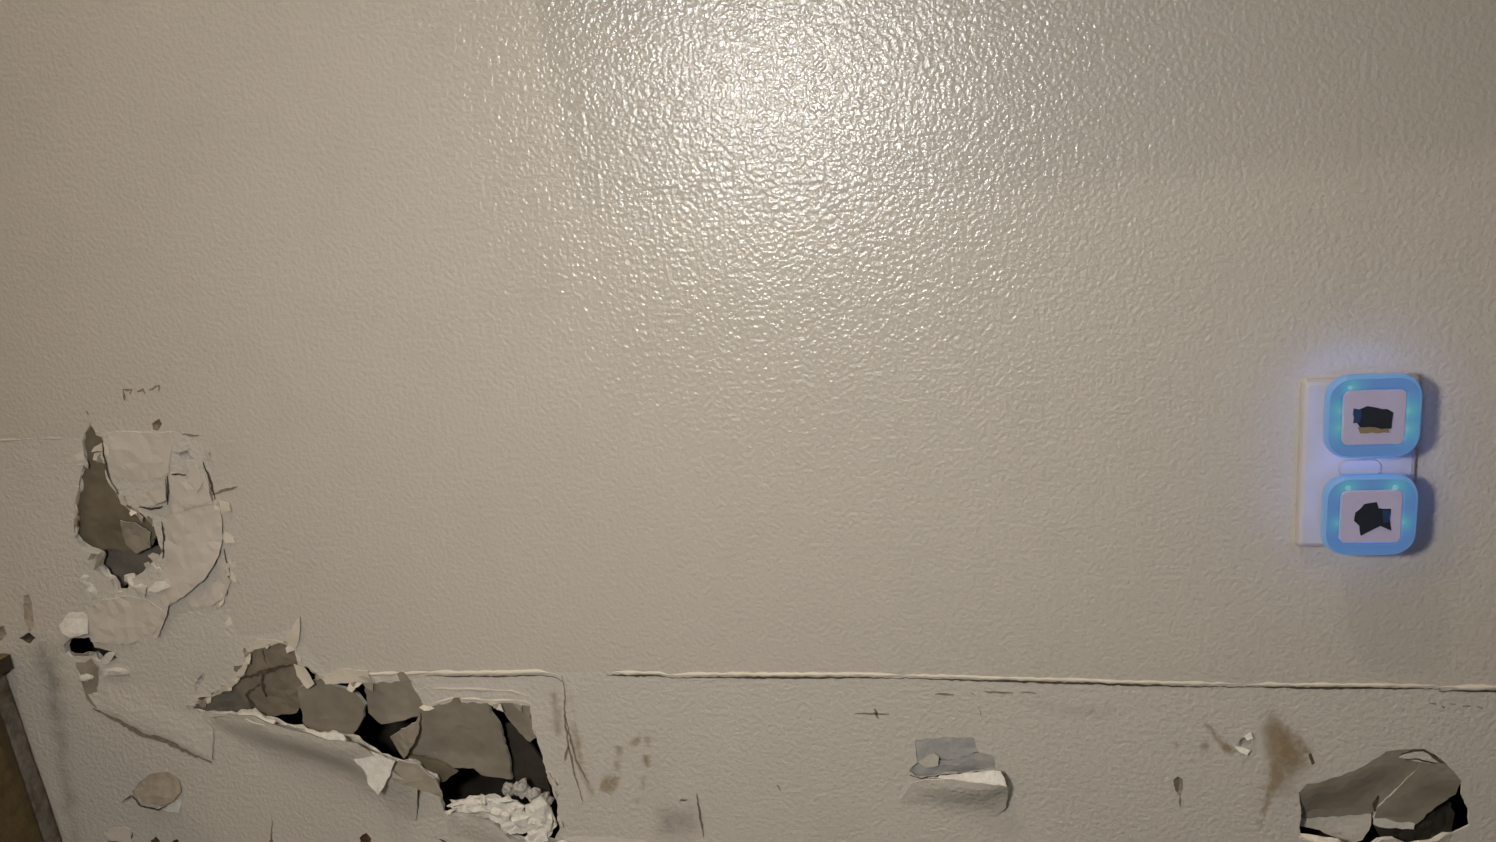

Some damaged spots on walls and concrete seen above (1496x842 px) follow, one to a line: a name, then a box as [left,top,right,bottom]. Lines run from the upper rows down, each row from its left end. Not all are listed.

peeling [354,751,395,795]
spalling [909,737,1007,787]
spalling [1373,817,1415,830]